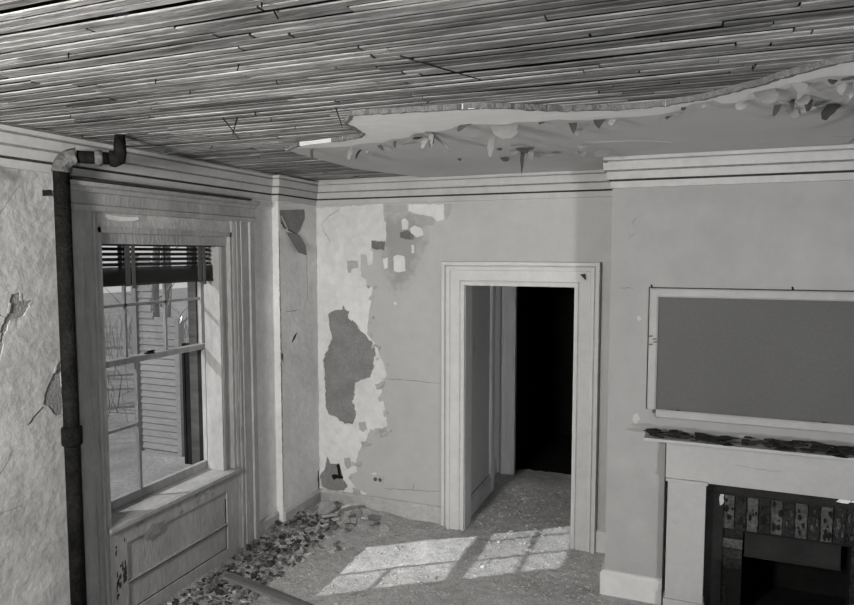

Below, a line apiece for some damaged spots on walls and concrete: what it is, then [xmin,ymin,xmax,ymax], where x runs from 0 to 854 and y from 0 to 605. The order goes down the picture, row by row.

flaking render [0,0,854,181]
spalling [0,293,33,354]
peeling [316,203,452,495]